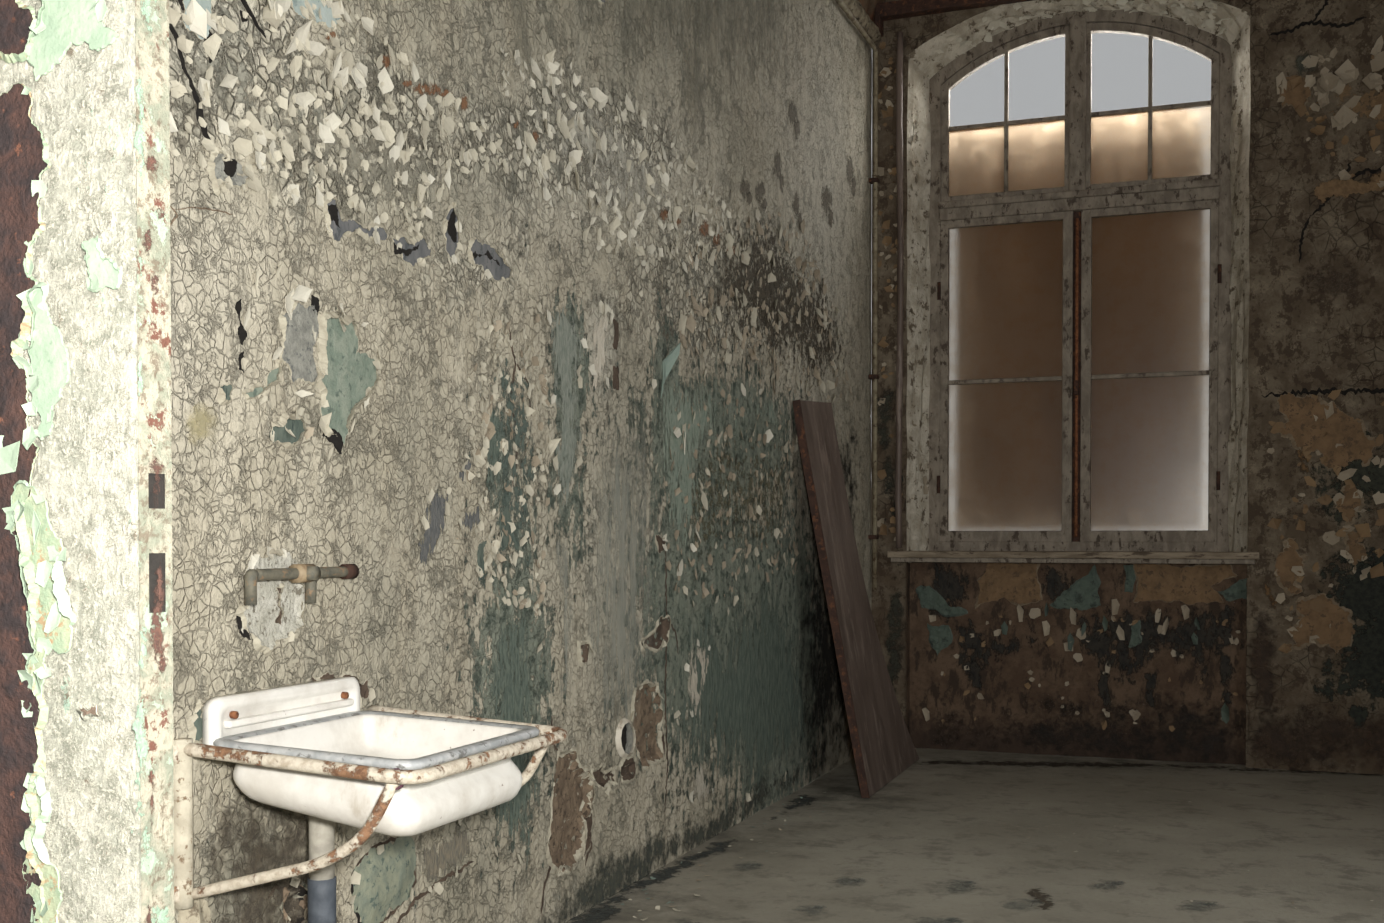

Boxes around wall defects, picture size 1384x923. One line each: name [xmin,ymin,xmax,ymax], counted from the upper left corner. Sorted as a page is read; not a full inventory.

rust [0,0,36,63]
peeling [25,0,119,81]
crack [170,205,232,226]
peeling [217,270,382,461]
water stain [678,153,854,403]
rust [0,82,62,923]
peeling [2,480,76,729]
peeling [418,300,806,913]
water stain [544,514,848,923]
water stain [923,562,1037,691]
water stain [988,544,1384,770]
peeling [1267,389,1384,655]